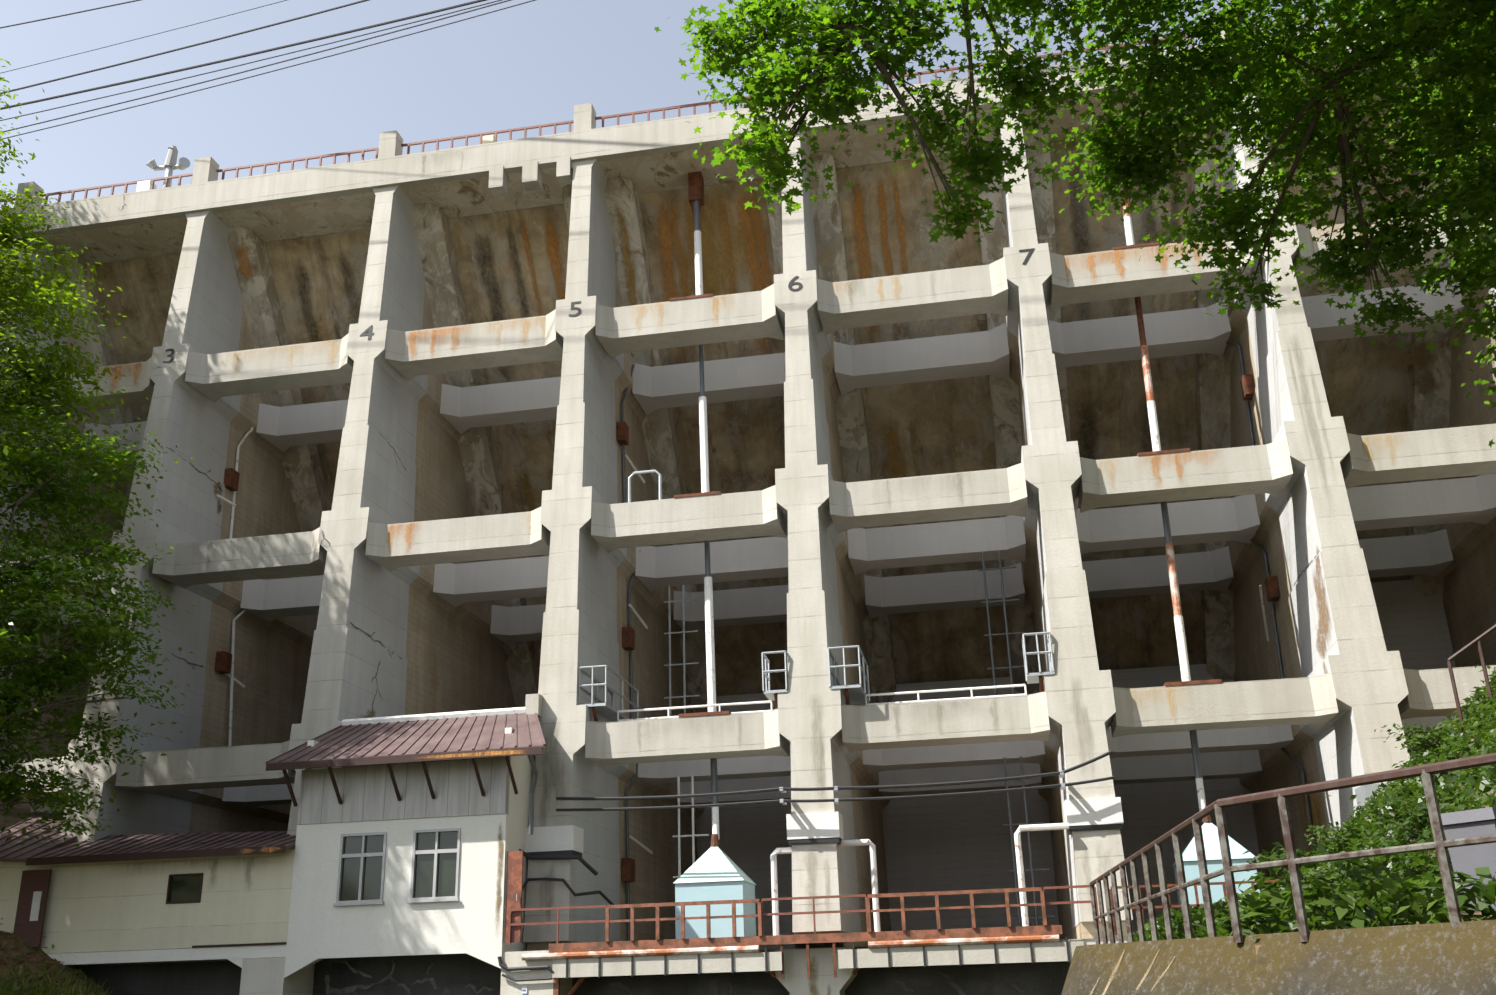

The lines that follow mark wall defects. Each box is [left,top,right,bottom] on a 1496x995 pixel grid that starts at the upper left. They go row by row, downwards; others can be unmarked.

water stain [509,222,565,315]
water stain [617,212,635,305]
water stain [657,194,783,301]
water stain [853,185,948,279]